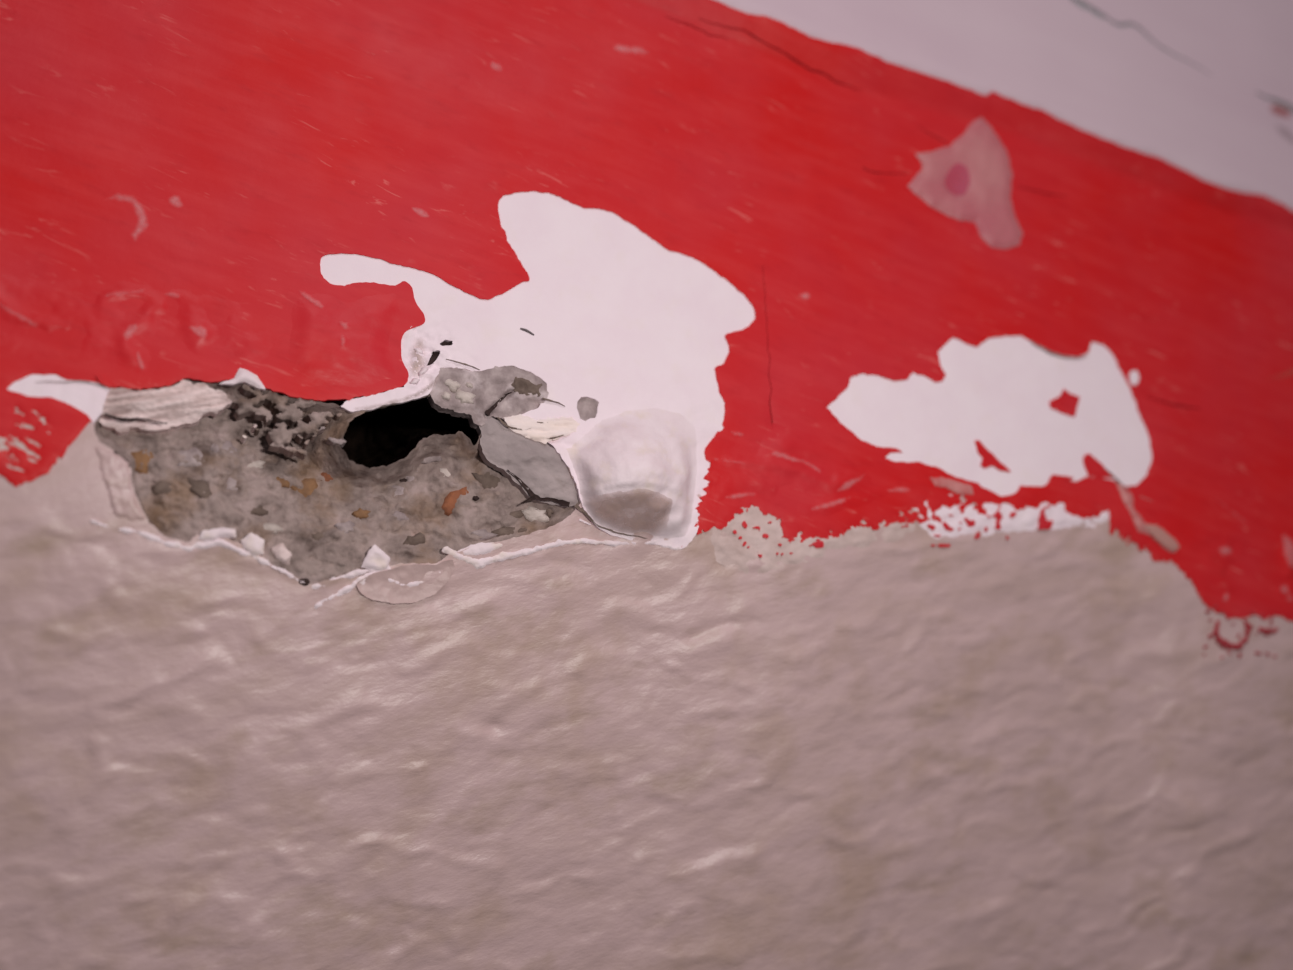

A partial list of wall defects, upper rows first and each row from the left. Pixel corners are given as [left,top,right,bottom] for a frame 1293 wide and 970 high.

crack [1072,0,1211,75]
flaking render [0,191,1152,609]